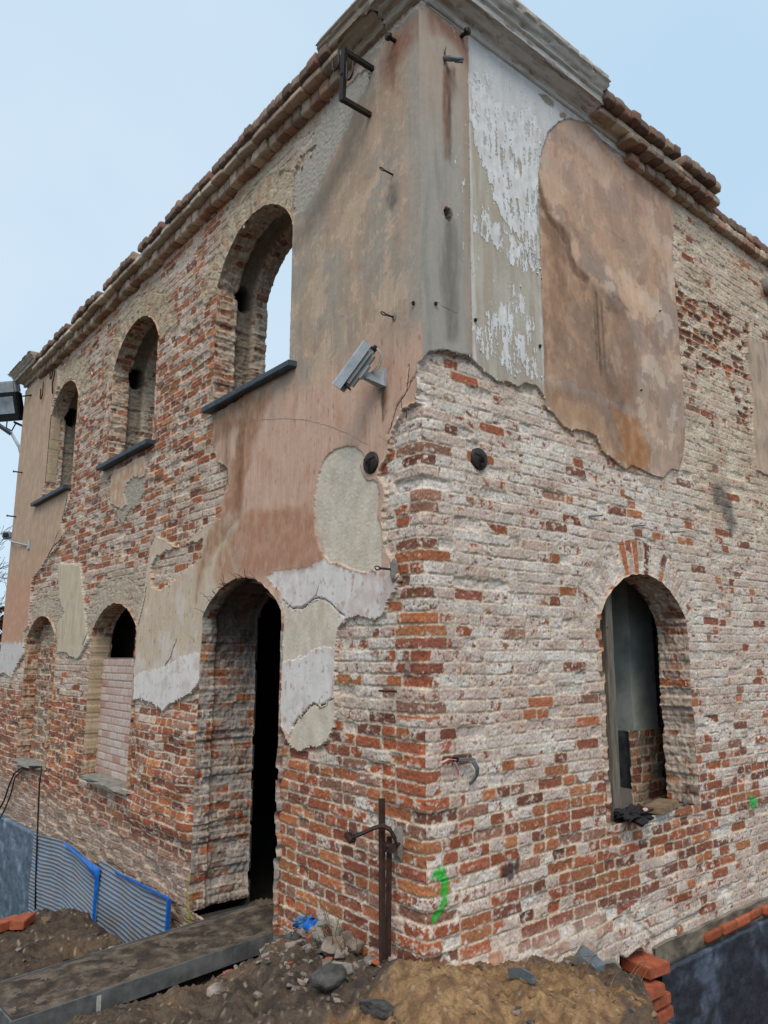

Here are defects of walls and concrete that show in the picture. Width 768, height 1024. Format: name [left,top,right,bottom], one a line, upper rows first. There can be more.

crack [388,366,419,433]
flaking render [266,63,690,751]
spalling [674,278,753,432]
flaking render [150,538,203,590]